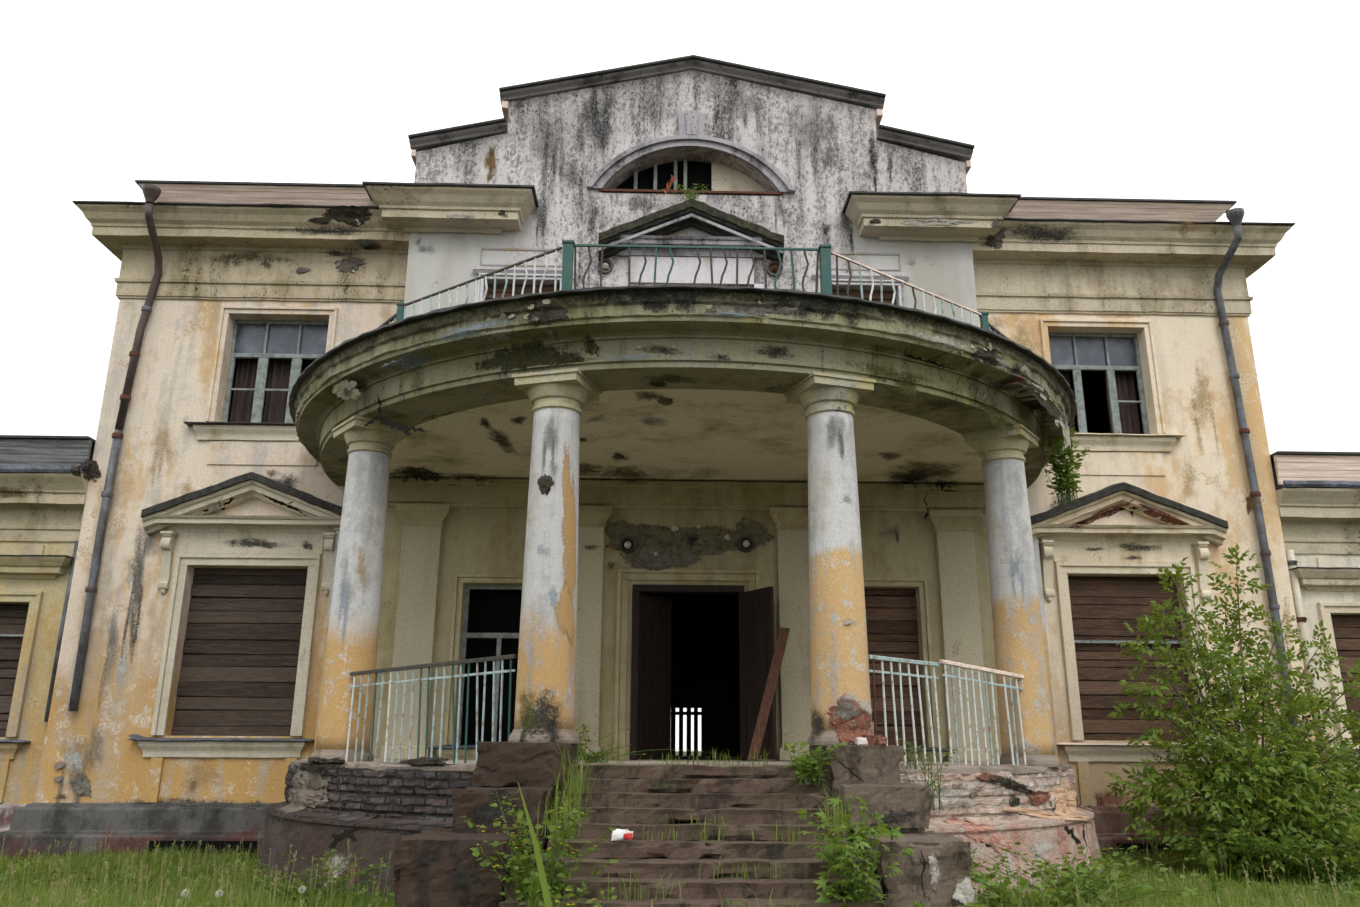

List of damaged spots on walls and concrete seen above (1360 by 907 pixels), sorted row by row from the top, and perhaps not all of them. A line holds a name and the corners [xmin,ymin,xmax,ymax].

damp [869,132,877,191]
damp [1004,224,1078,243]
damp [582,286,711,313]
damp [475,336,599,372]
damp [0,487,27,497]
damp [389,466,494,486]
peeling [537,446,576,641]
peeling [604,516,774,571]
damp [102,535,152,688]
flaking render [811,692,875,745]
damp [54,735,101,805]
spalling [934,772,1055,857]